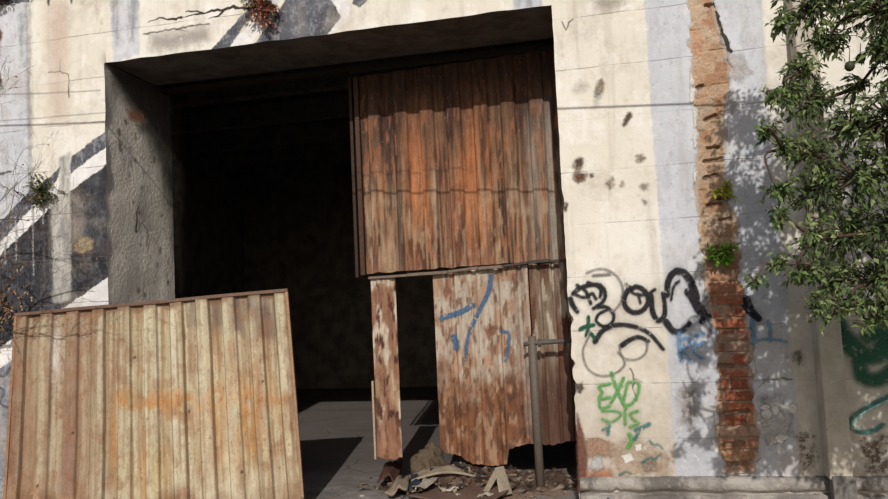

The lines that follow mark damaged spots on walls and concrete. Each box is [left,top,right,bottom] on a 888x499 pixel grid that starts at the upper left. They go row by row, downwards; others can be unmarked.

crack [143,5,253,34]
spalling [687,0,815,475]
peeling [610,441,670,477]